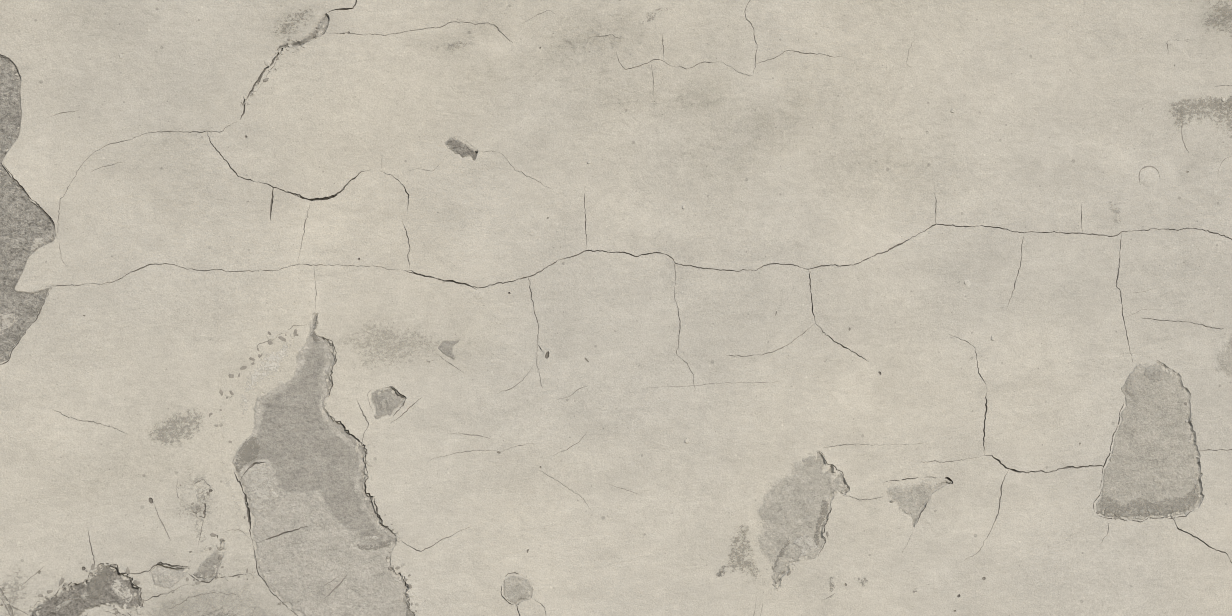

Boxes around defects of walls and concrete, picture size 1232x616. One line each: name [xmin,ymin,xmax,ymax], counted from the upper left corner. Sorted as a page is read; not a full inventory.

spalling [0,54,56,365]
spalling [441,133,478,161]
crack [46,0,1232,443]
spalling [0,532,227,616]
crack [106,462,311,616]
flaking render [229,313,417,616]
crack [431,432,590,509]
spalling [750,450,850,593]
spalling [882,477,953,528]
crack [824,334,1102,561]
spalling [1093,360,1205,522]
crack [1173,519,1232,563]